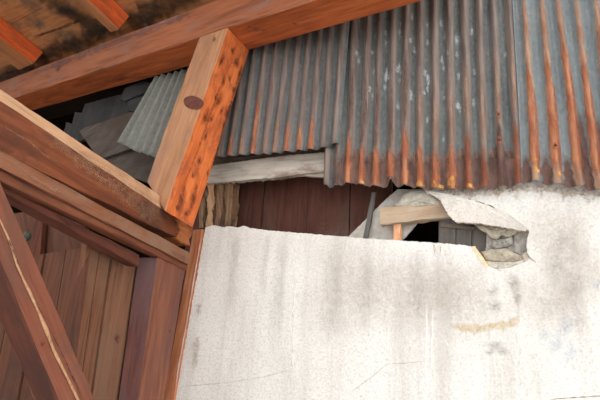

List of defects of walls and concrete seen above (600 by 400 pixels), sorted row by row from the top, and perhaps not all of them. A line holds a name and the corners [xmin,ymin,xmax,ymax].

corrosion [250,101,259,153]
corrosion [297,119,313,149]
corrosion [334,0,600,195]
spalling [424,189,529,269]